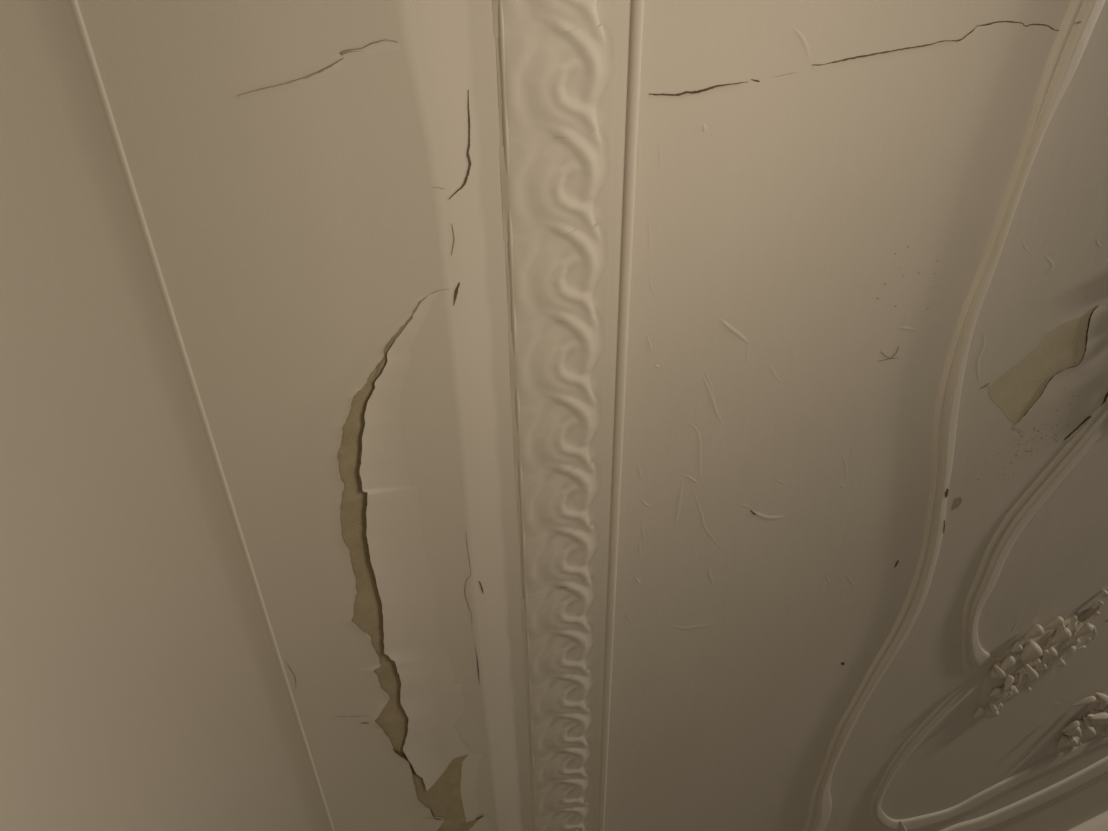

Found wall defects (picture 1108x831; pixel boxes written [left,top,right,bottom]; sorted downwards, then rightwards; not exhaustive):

crack [238,39,401,103]
crack [649,21,1081,102]
crack [432,90,471,199]
crack [1064,392,1108,442]
peeling [323,289,492,831]